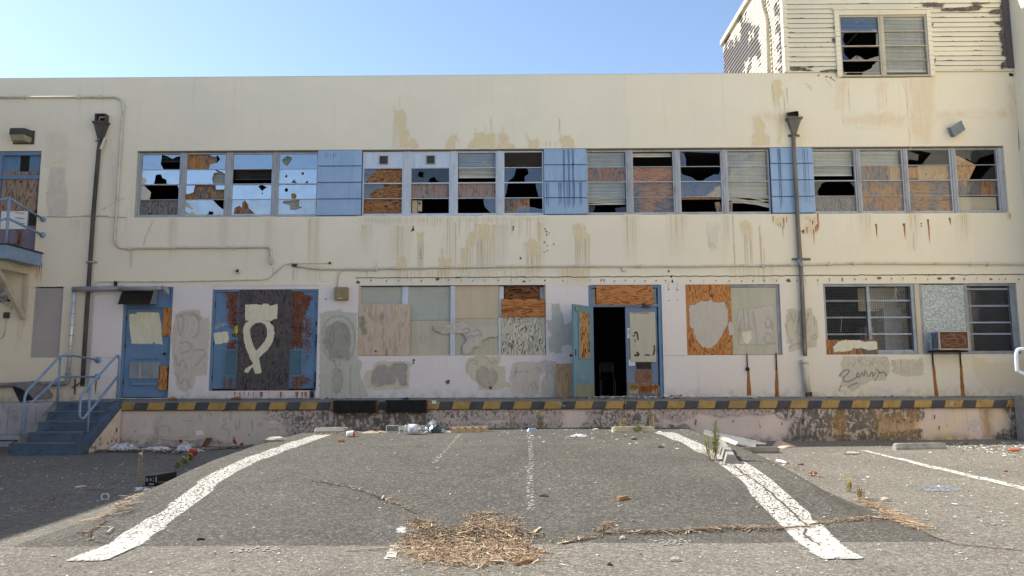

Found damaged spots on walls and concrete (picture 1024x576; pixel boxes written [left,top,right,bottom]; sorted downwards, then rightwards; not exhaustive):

peeling [914,2,1014,76]
damp [392,105,420,149]
damp [445,118,575,149]
damp [751,79,807,147]
damp [356,215,592,288]
corrosion [771,214,822,237]